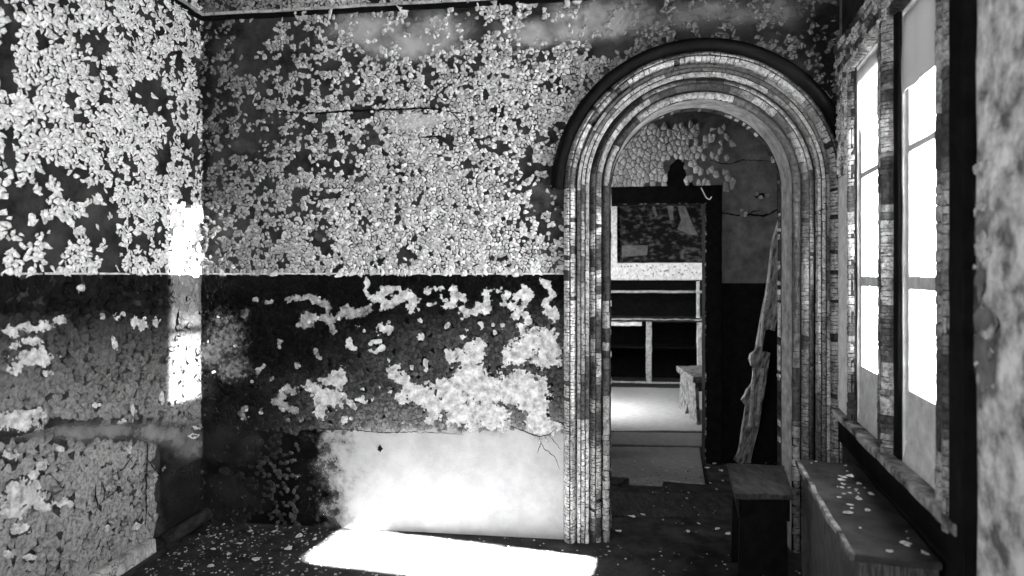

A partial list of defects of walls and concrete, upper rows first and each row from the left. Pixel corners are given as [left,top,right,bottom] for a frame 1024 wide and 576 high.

crack [276,107,466,138]
crack [722,209,777,217]
flaking render [0,0,840,540]
crack [0,271,564,576]
flaking render [2,550,37,561]